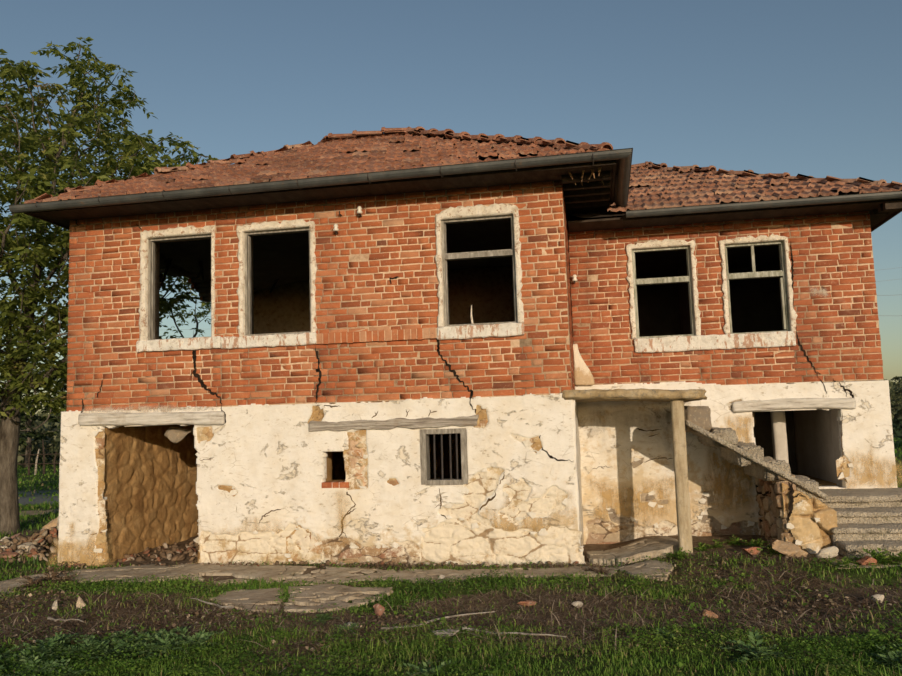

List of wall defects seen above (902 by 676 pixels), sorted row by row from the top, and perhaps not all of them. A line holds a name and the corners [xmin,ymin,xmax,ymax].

crack [190,350,226,423]
flaking render [308,405,325,424]
crack [315,346,341,408]
crack [436,338,476,429]
crack [790,246,854,483]
flaking render [343,429,368,490]
crack [539,435,607,469]
crack [337,492,356,538]
flaking render [200,462,678,566]
flaking render [691,491,760,536]